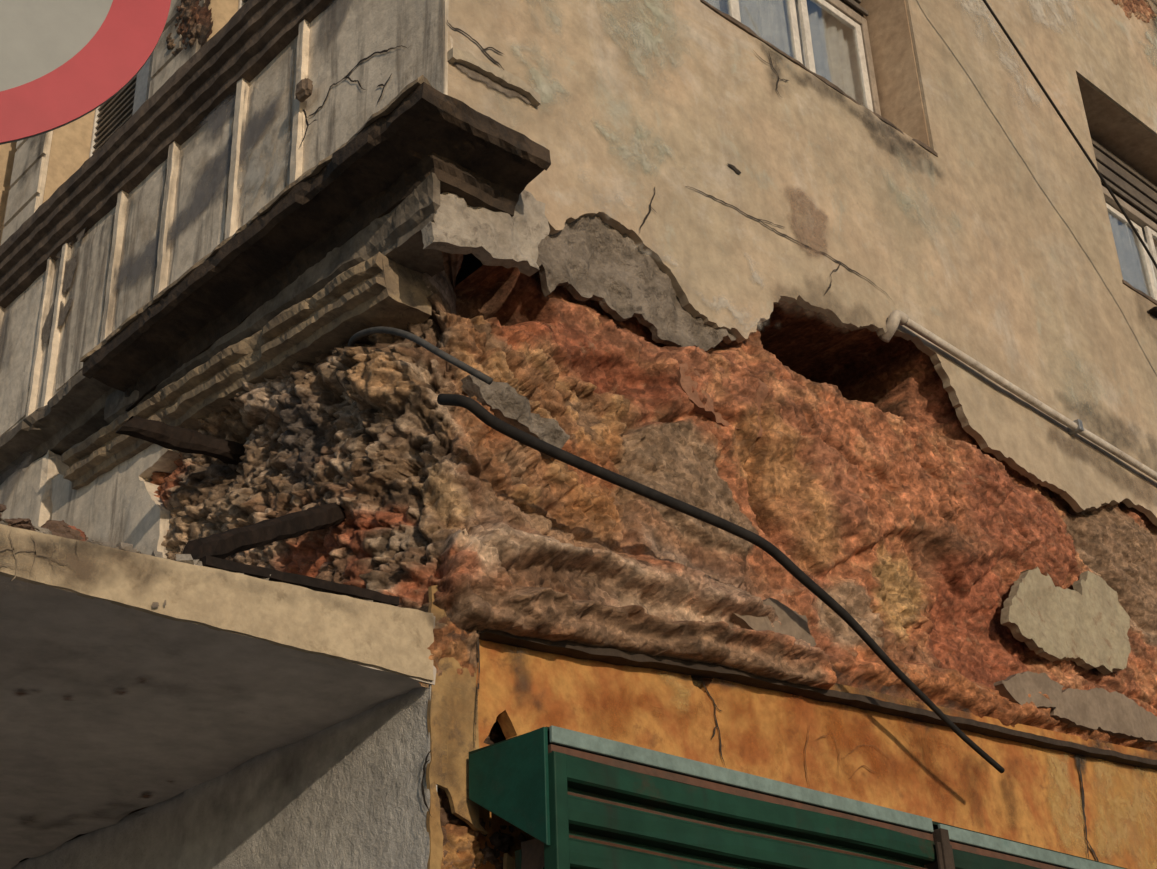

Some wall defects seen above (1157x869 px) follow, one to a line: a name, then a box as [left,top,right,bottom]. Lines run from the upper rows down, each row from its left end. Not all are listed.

spalling [166,0,213,57]
crack [447,20,504,70]
spalling [1111,0,1157,64]
crack [300,45,410,145]
crack [640,187,657,230]
crack [685,186,891,299]
spalling [150,190,1157,753]
crack [703,684,725,765]
spalling [437,787,527,869]
crack [1078,754,1099,862]